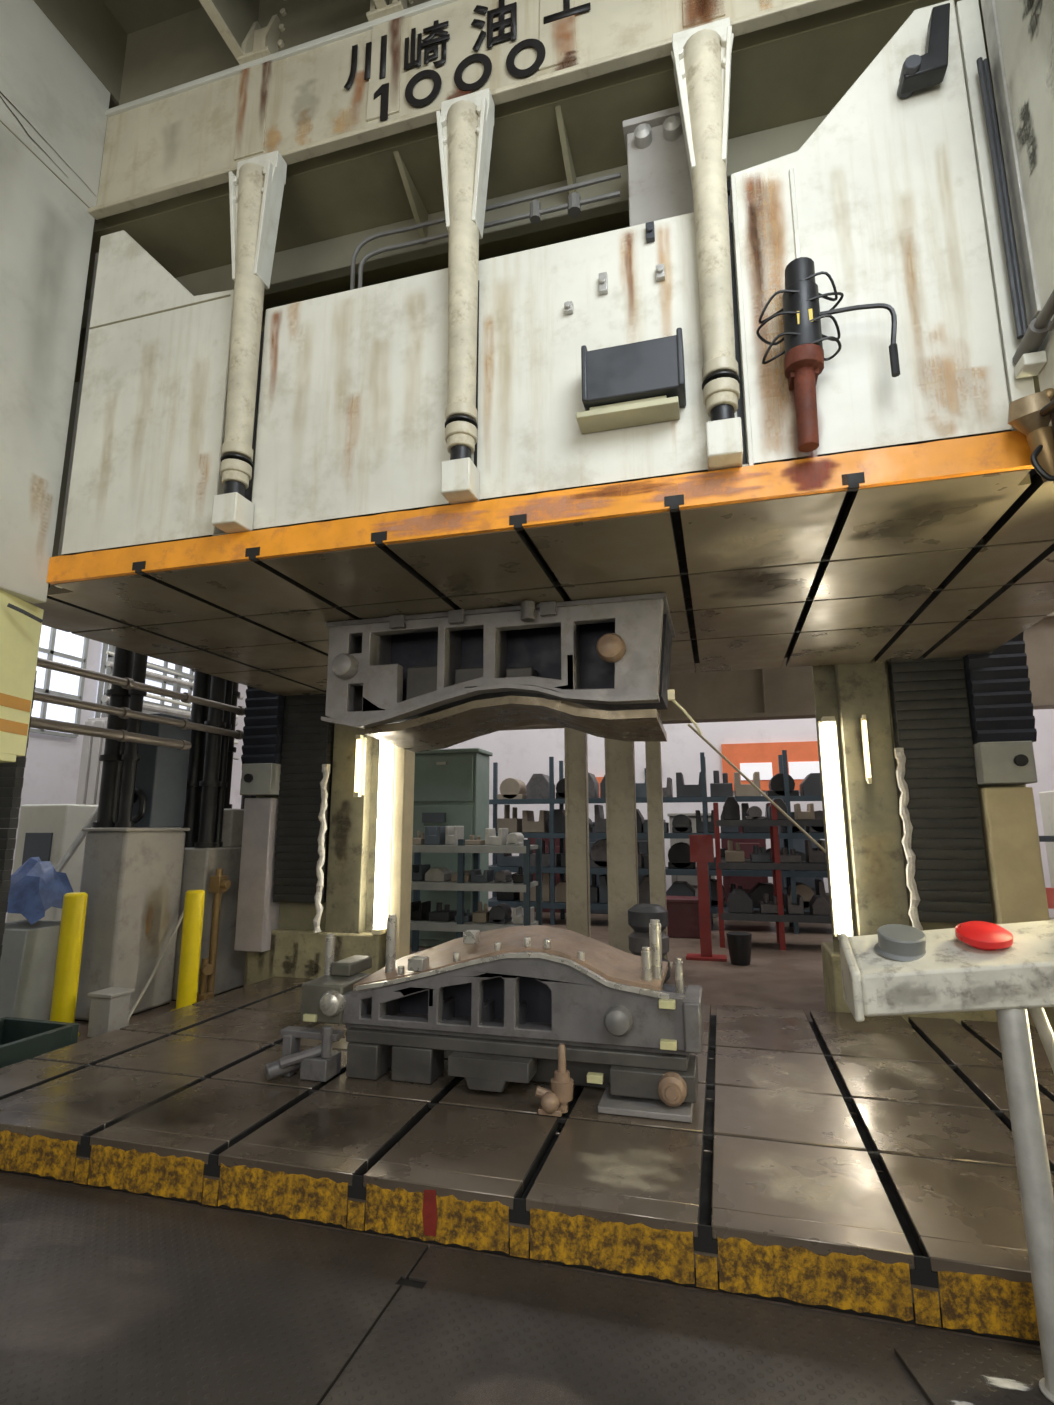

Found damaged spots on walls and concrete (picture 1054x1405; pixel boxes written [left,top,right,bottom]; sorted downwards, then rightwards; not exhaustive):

corrosion [689,0,716,24]
corrosion [747,180,784,349]
corrosion [785,451,836,490]